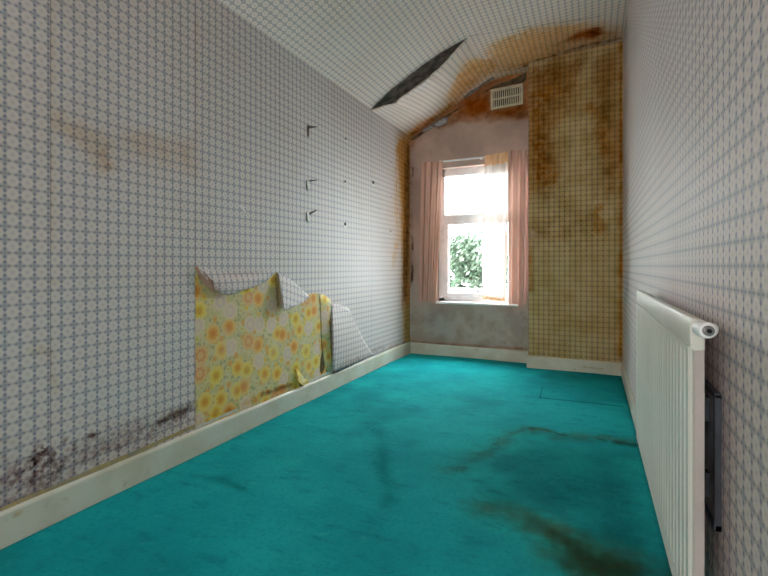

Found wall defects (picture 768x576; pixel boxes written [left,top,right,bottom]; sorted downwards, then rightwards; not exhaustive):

crack [374,40,465,108]